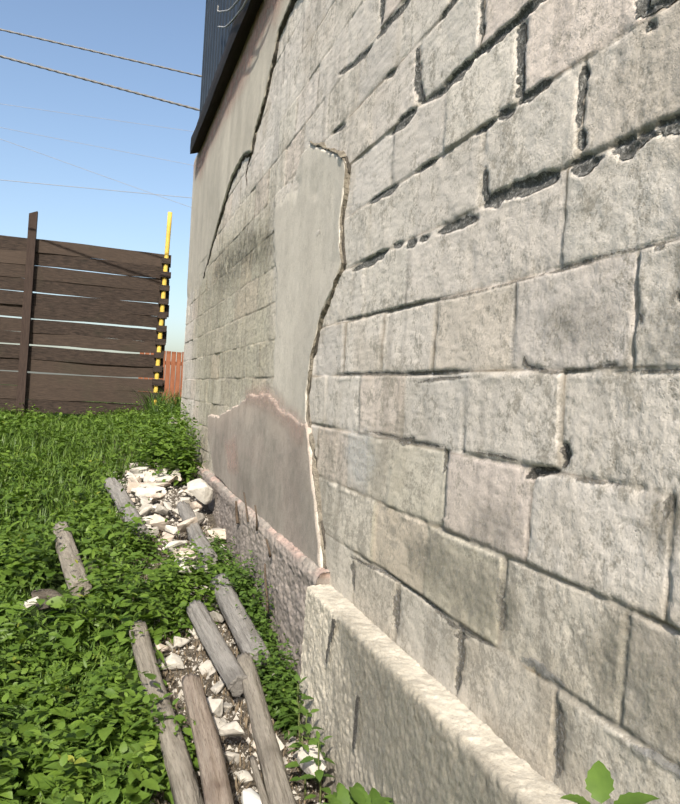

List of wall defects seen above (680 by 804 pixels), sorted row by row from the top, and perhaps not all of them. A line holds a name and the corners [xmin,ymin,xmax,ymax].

spalling [340,0,411,75]
spalling [392,0,552,135]
spalling [635,0,675,31]
crack [203,0,297,278]
spalling [571,65,603,177]
spalling [612,114,680,160]
spalling [482,169,559,208]
spalling [352,235,429,271]
crack [306,150,680,569]
crack [325,619,336,664]
crack [350,557,506,694]
crack [352,695,360,749]